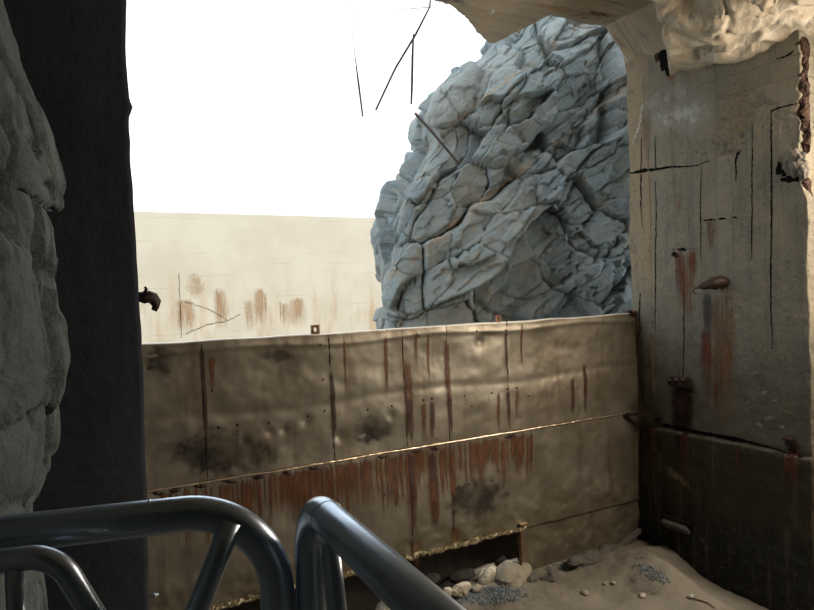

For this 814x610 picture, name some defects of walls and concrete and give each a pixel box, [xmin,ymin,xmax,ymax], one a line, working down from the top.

spalling [775,37,813,197]
crack [630,136,710,370]
crack [735,103,799,349]
corrosion [152,433,533,517]
corrosion [404,364,435,435]
corrosion [444,345,452,429]
corrosion [497,392,519,420]
corrosion [672,387,693,465]
corrosion [702,296,731,400]
crack [661,424,803,460]